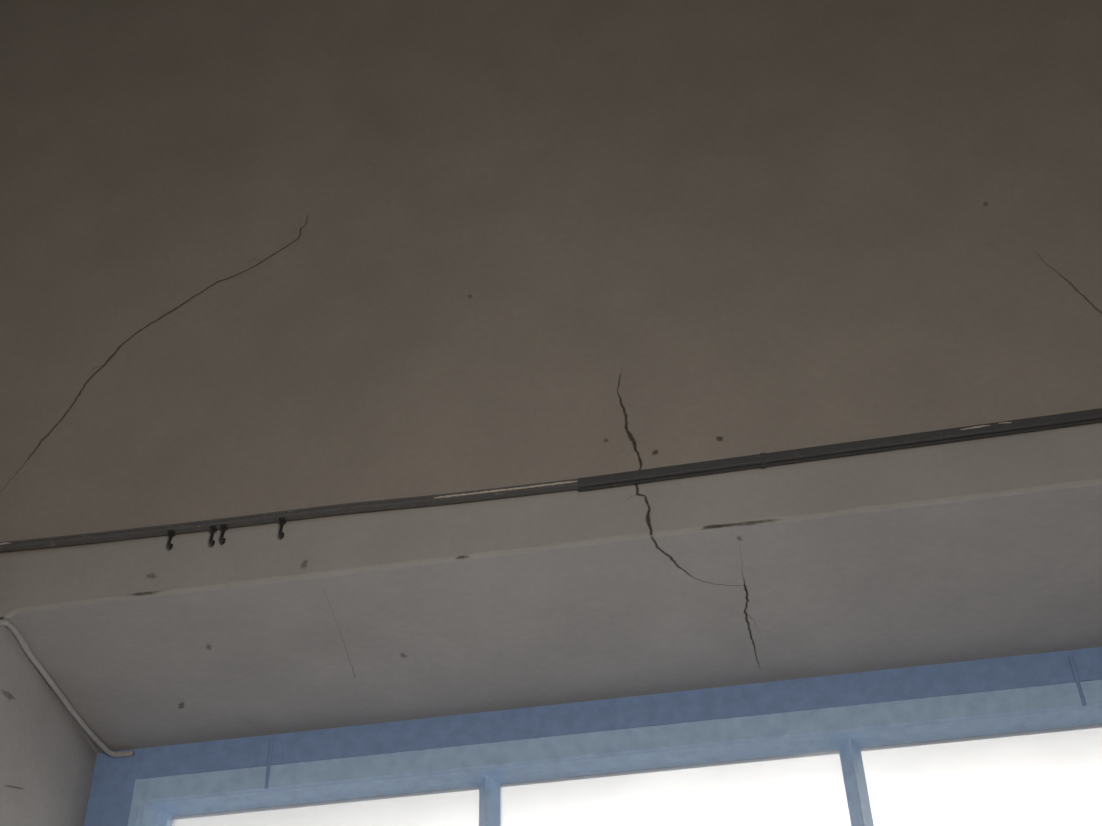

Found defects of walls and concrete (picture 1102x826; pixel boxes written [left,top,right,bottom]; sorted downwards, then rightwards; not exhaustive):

crack [32,226,304,454]
crack [618,376,696,579]
crack [744,580,759,664]